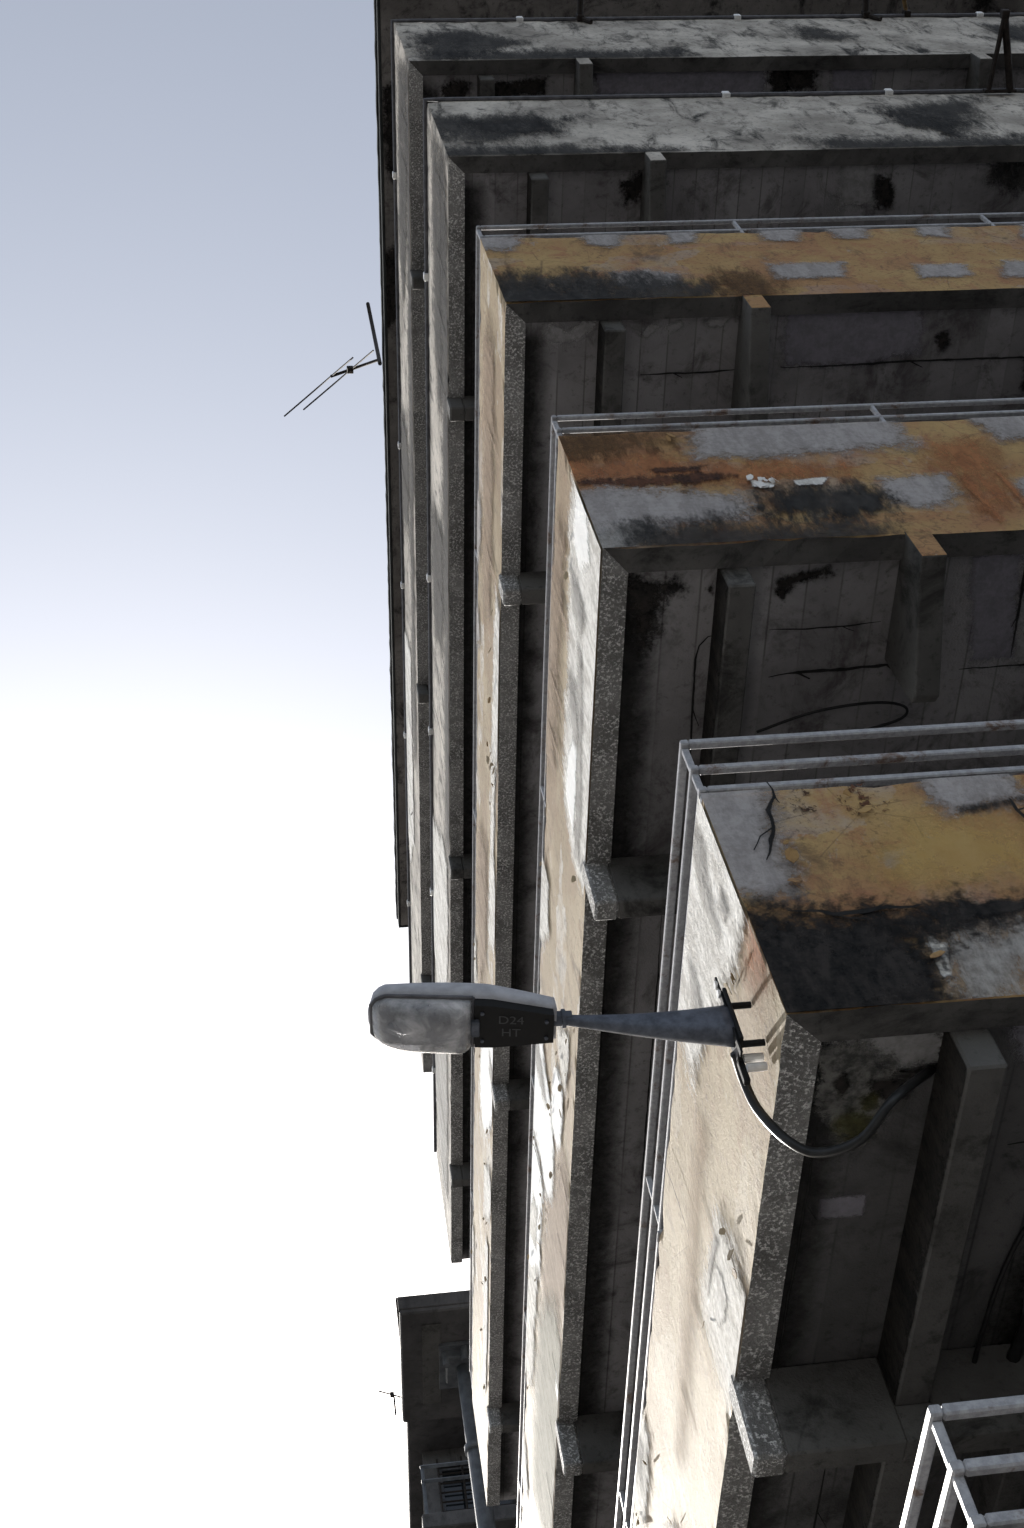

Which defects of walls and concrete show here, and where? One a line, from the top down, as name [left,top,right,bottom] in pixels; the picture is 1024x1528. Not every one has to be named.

leakage [791,98,1024,210]
corrosion [559,431,852,487]
crack [959,571,1024,670]
crack [754,782,780,860]
corrosion [838,784,890,814]
leakage [743,879,1024,1013]
peeling [524,1027,569,1394]
peeling [700,1205,745,1416]